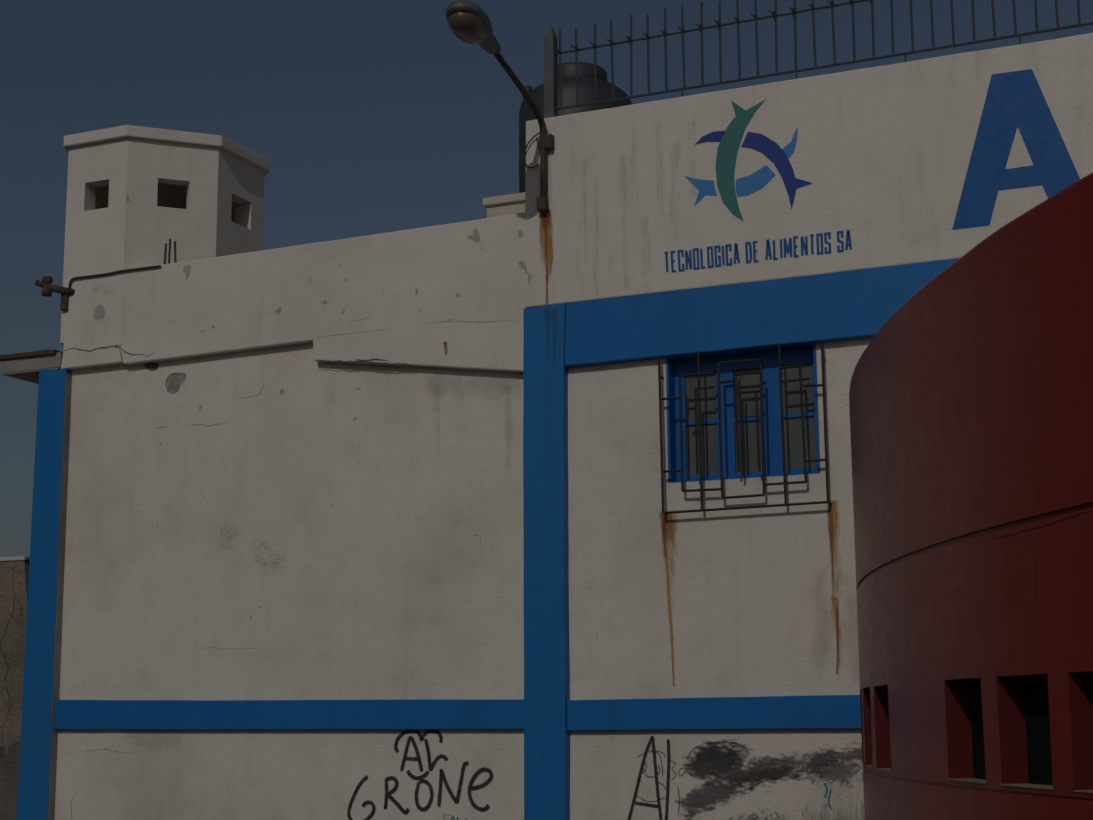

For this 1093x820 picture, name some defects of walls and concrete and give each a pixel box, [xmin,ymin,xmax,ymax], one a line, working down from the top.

rust [540,209,552,304]
crack [64,345,155,360]
rust [828,500,837,577]
rust [661,513,675,686]